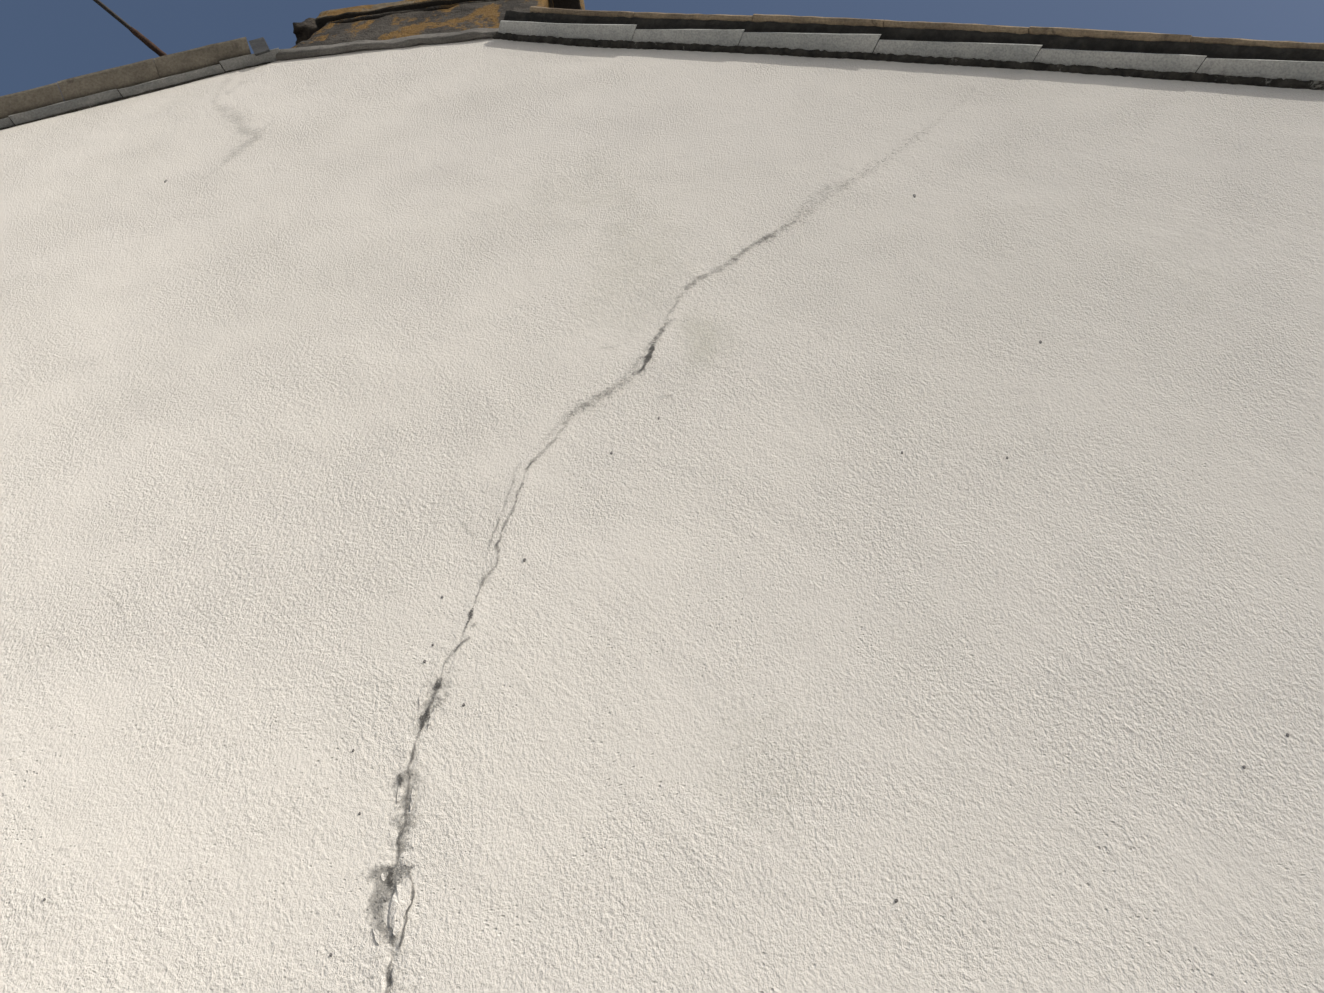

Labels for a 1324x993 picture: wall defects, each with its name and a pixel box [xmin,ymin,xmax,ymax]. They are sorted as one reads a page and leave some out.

crack [608,329,661,385]
crack [368,461,534,993]